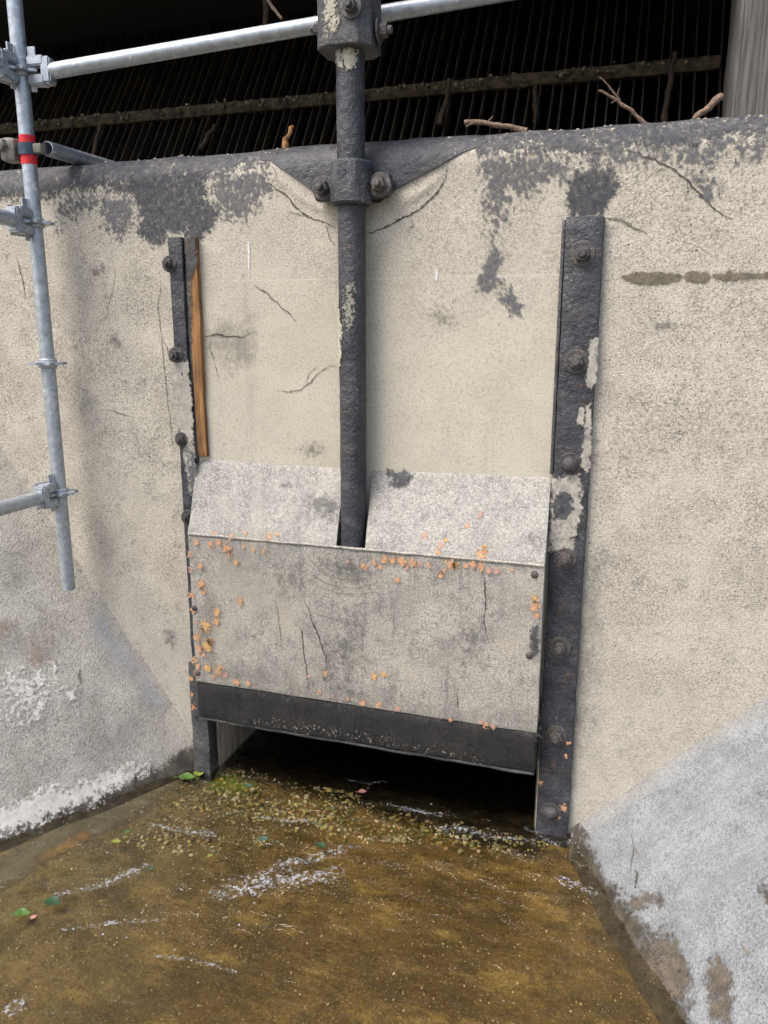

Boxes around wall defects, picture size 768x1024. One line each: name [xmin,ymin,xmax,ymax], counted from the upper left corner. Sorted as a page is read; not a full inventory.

crack [367,169,447,234]
crack [624,150,734,219]
crack [256,286,295,320]
damp [498,279,524,317]
damp [622,270,768,286]
crack [284,365,335,392]
peeling [551,491,575,520]
crack [276,601,337,690]
damp [0,747,194,853]
damp [567,823,690,1024]